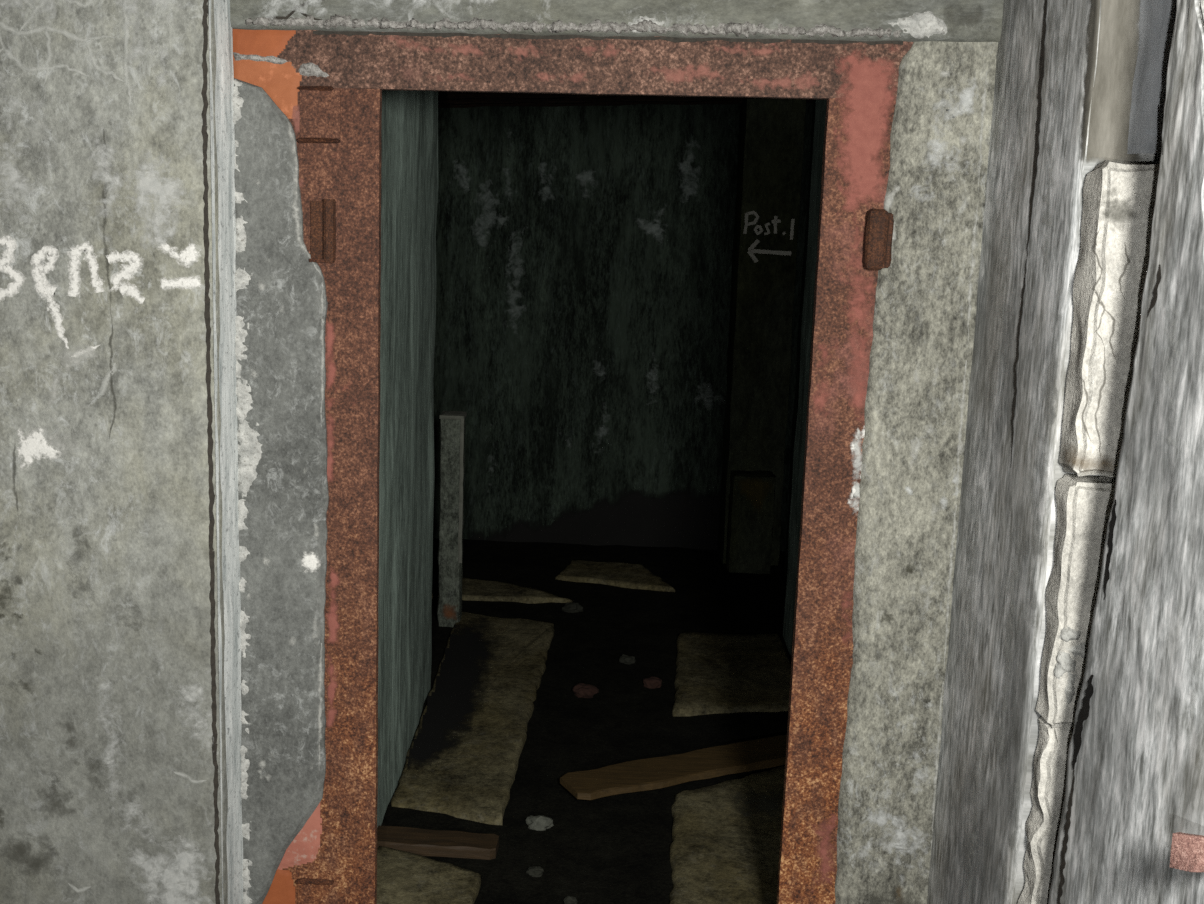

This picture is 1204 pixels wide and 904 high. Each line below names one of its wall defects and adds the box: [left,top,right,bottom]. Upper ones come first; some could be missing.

spalling [232,29,329,131]
efflorescence [1,156,26,207]
efflorescence [93,141,119,213]
efflorescence [136,165,183,243]
efflorescence [131,841,210,904]
spalling [262,803,322,904]